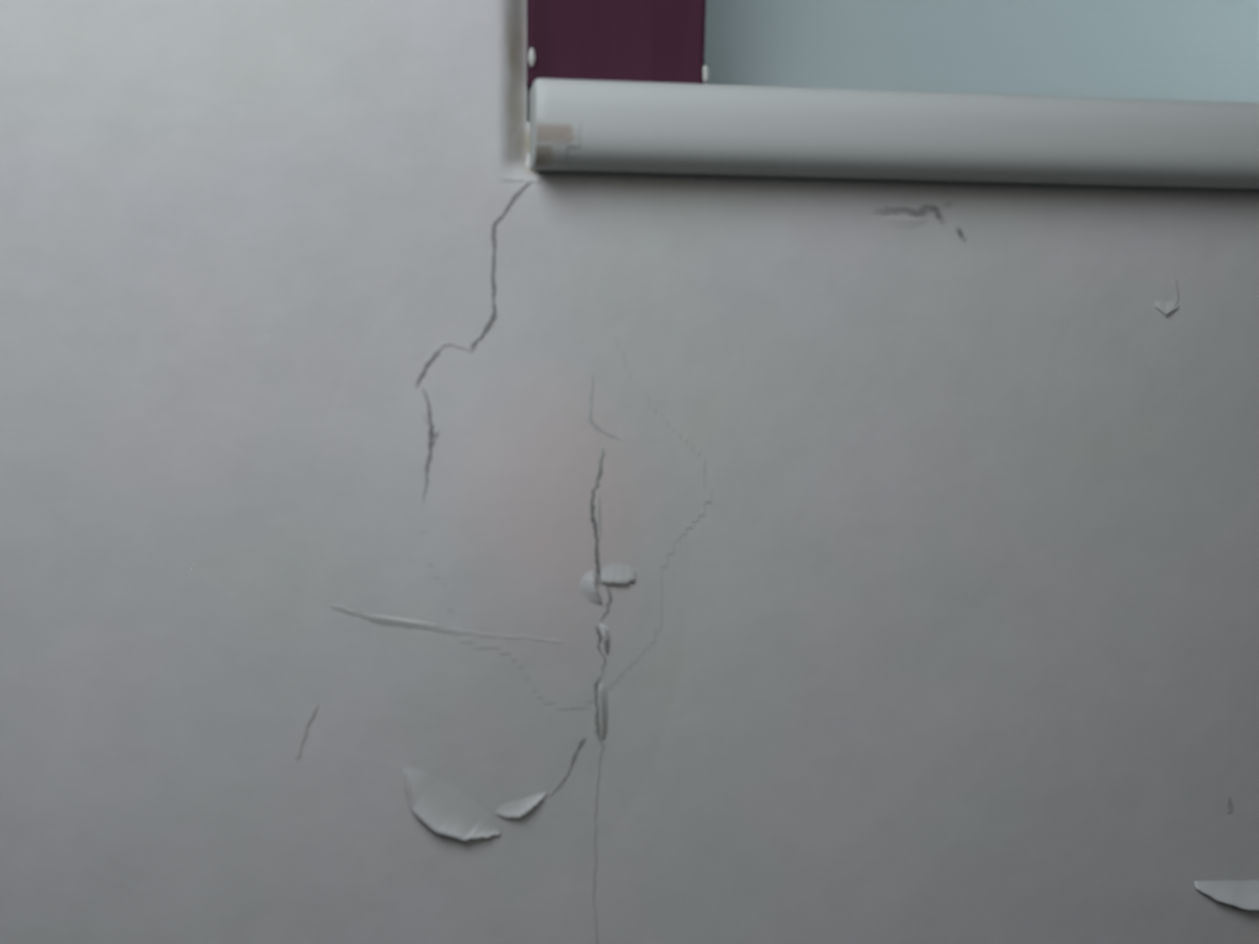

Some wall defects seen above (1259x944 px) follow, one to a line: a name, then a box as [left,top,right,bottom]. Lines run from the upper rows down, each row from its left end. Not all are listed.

crack [414,177,535,504]
crack [331,604,563,644]
crack [547,374,636,944]
peeling [1194,880,1259,911]